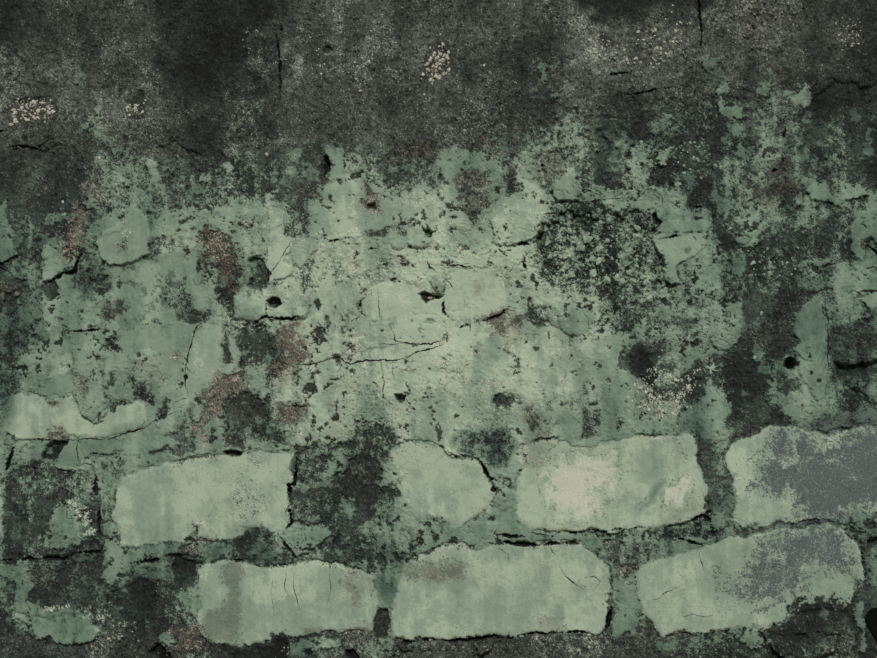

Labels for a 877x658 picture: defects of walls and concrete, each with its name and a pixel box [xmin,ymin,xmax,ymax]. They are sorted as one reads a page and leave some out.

water stain [144,0,292,99]
crack [275,24,283,91]
water stain [572,0,716,37]
crack [697,0,706,46]
spalling [794,77,877,209]
spalling [490,172,713,304]
peeling [69,333,171,424]
crack [291,290,445,407]
peeling [230,264,512,370]
crack [427,261,512,328]
peeling [788,295,830,401]
crack [1,320,206,563]